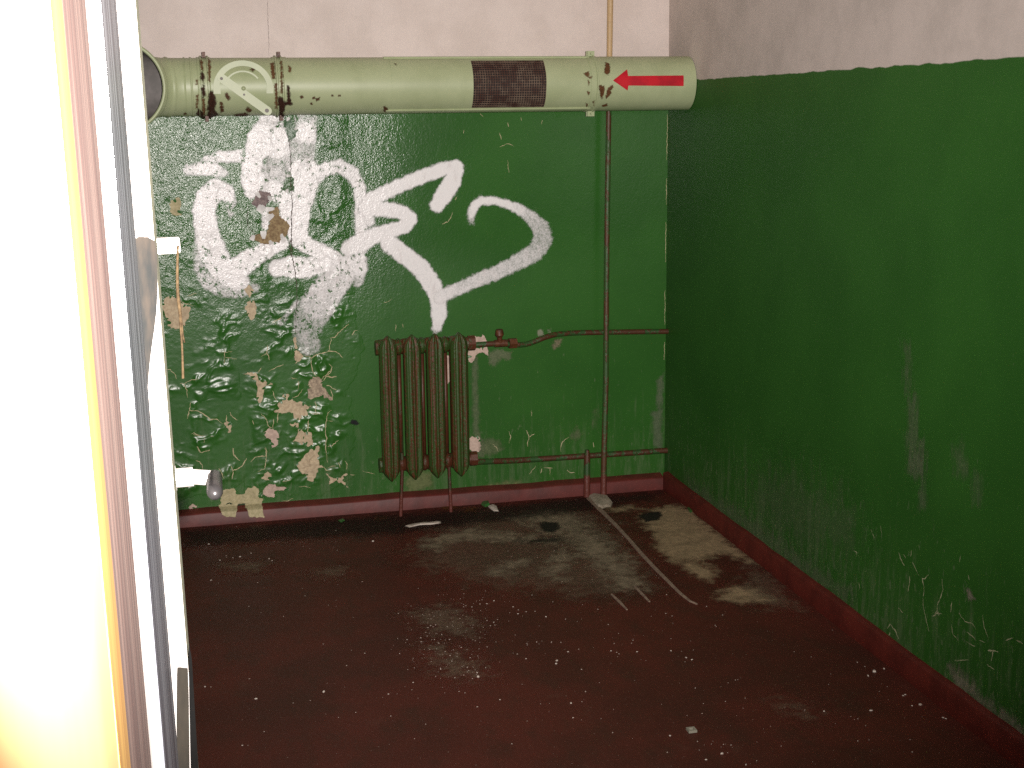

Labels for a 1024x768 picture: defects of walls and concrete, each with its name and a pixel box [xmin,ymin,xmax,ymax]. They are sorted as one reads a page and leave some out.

peeling [249,171,295,245]
peeling [162,295,191,329]
peeling [244,285,257,320]
crack [168,135,373,506]
peeling [293,337,304,363]
peeling [468,334,488,363]
peeling [245,372,272,403]
peeling [262,428,280,448]
peeling [274,377,348,487]
peeling [470,436,481,452]
peeling [219,472,289,518]